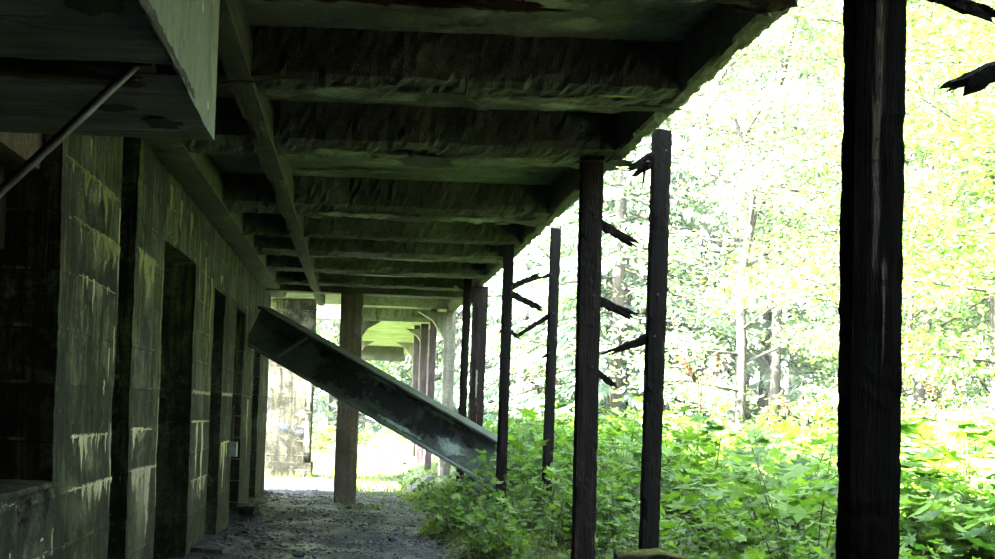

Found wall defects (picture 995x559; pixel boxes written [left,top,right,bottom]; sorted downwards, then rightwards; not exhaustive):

damp [68,423,112,506]
damp [130,355,160,540]